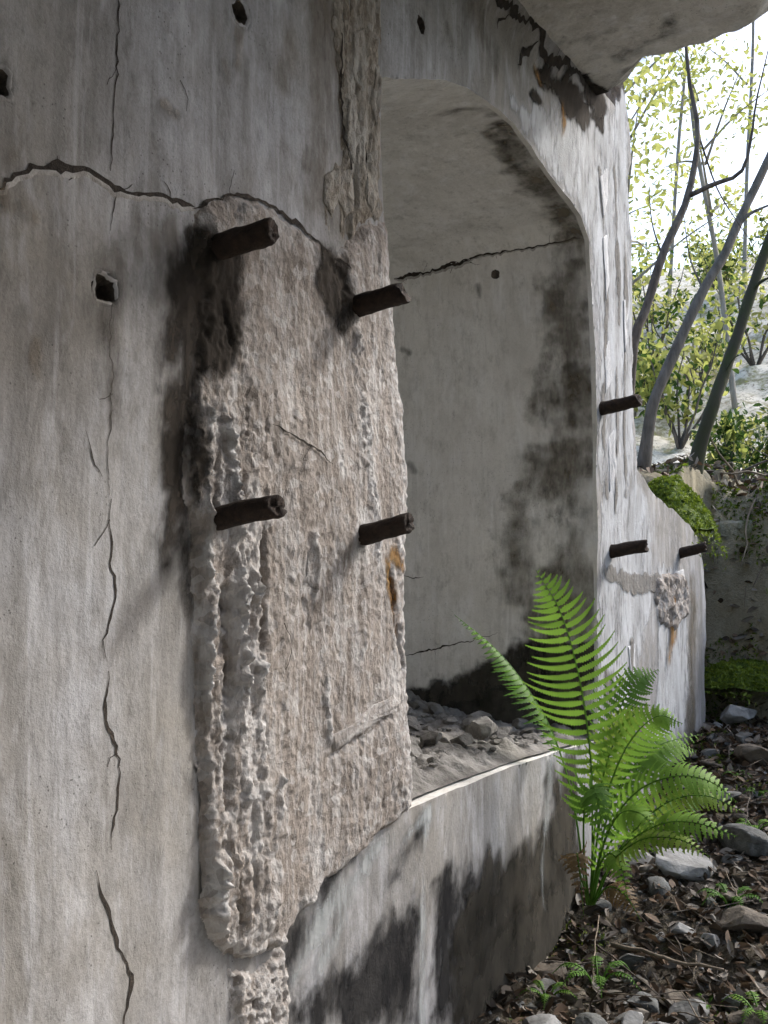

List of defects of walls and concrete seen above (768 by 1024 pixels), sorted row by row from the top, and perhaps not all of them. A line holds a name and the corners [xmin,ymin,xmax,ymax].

crack [0,0,352,269]
flaking render [323,0,390,295]
crack [394,236,580,282]
damp [483,122,583,241]
damp [516,260,593,508]
peeling [598,166,629,401]
crack [86,304,121,849]
spalling [180,196,413,1024]
rust [386,546,404,612]
spalling [605,564,690,630]
crack [96,870,134,1022]
damp [284,754,581,1024]